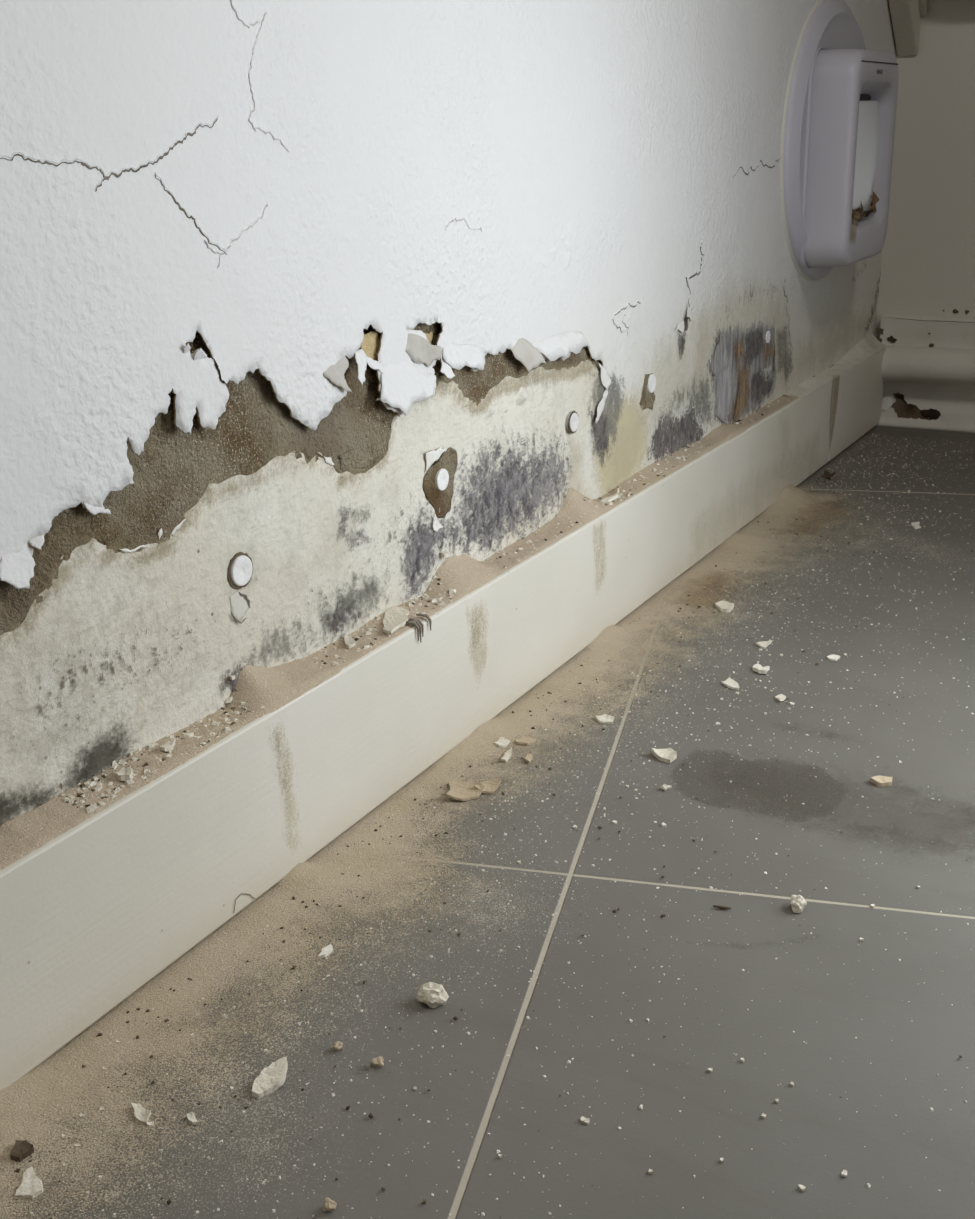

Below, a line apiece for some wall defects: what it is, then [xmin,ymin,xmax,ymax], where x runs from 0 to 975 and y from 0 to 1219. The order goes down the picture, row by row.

crack [230,0,290,152]
crack [0,116,268,268]
spalling [639,373,655,411]
spalling [882,393,941,420]
spalling [0,322,612,635]
mould [339,431,571,599]
mould [37,629,192,738]
mould [221,577,387,696]
spalling [721,677,739,690]
spalling [752,663,770,674]
mould [0,725,127,827]
spalling [651,748,677,763]